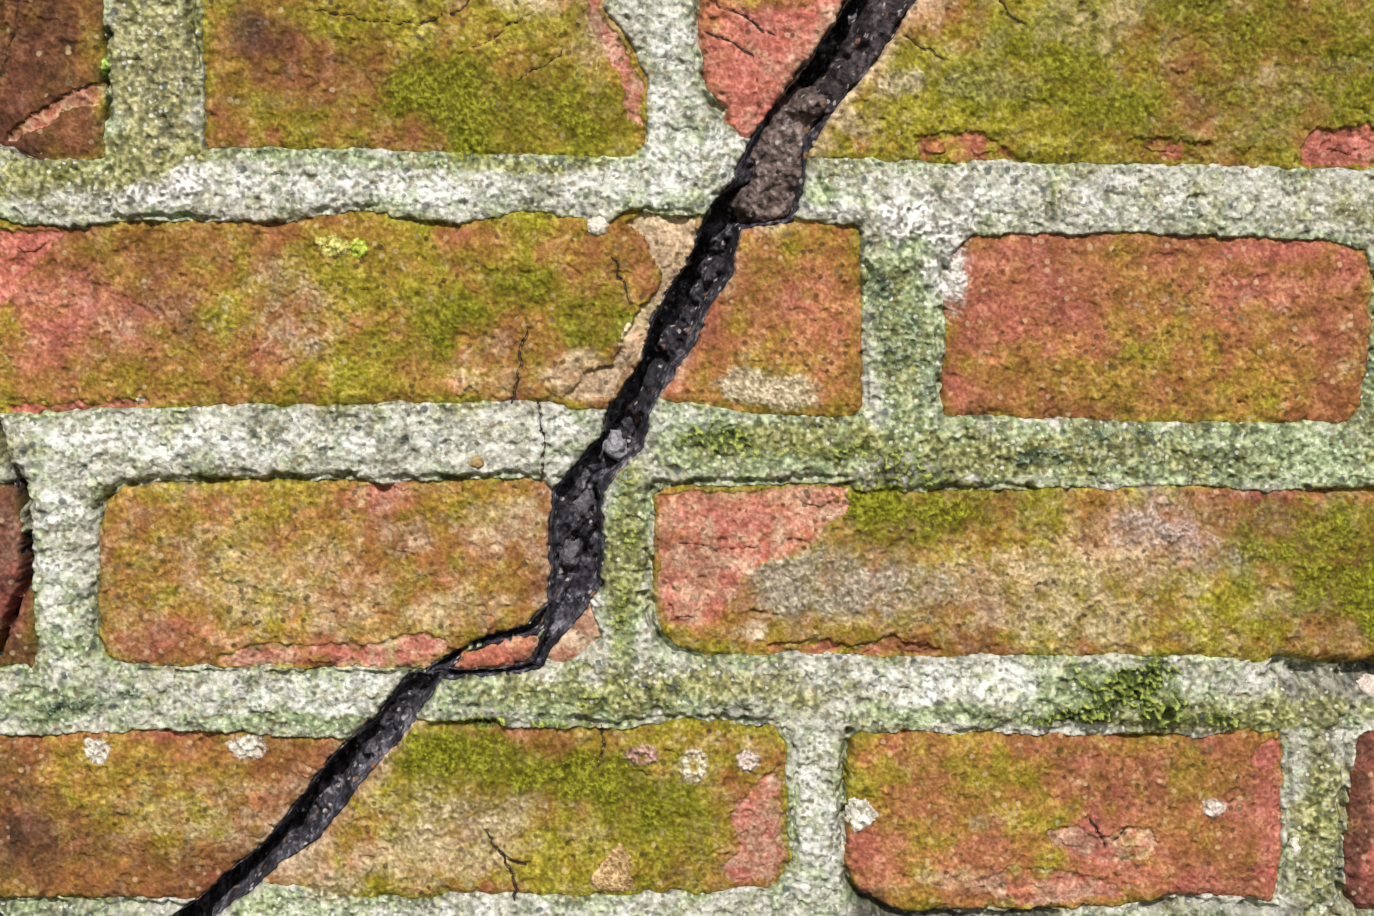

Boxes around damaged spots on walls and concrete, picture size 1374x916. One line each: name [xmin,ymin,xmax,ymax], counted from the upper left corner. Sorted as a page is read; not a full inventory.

crack [0,0,19,77]
crack [999,0,1025,24]
crack [10,467,28,494]
crack [173,0,945,916]
crack [14,532,35,614]